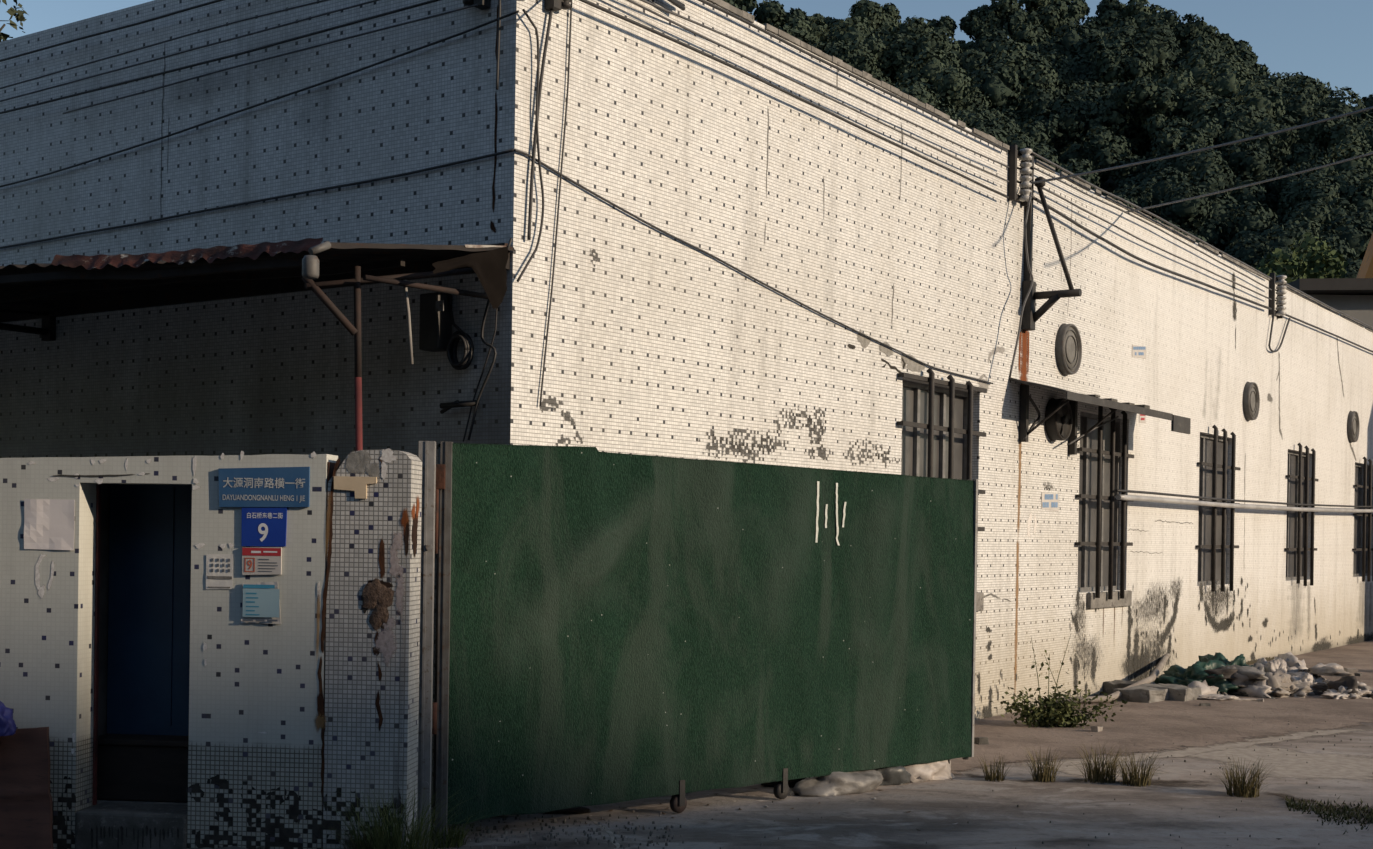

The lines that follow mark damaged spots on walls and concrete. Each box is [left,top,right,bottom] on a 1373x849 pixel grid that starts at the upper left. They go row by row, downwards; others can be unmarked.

peeling [699,406,900,468]
rust [401,498,420,556]
spalling [361,578,394,656]
leakage [1069,580,1182,697]
leakage [1198,577,1373,665]
peeling [50,776,76,849]
peeling [185,773,404,849]